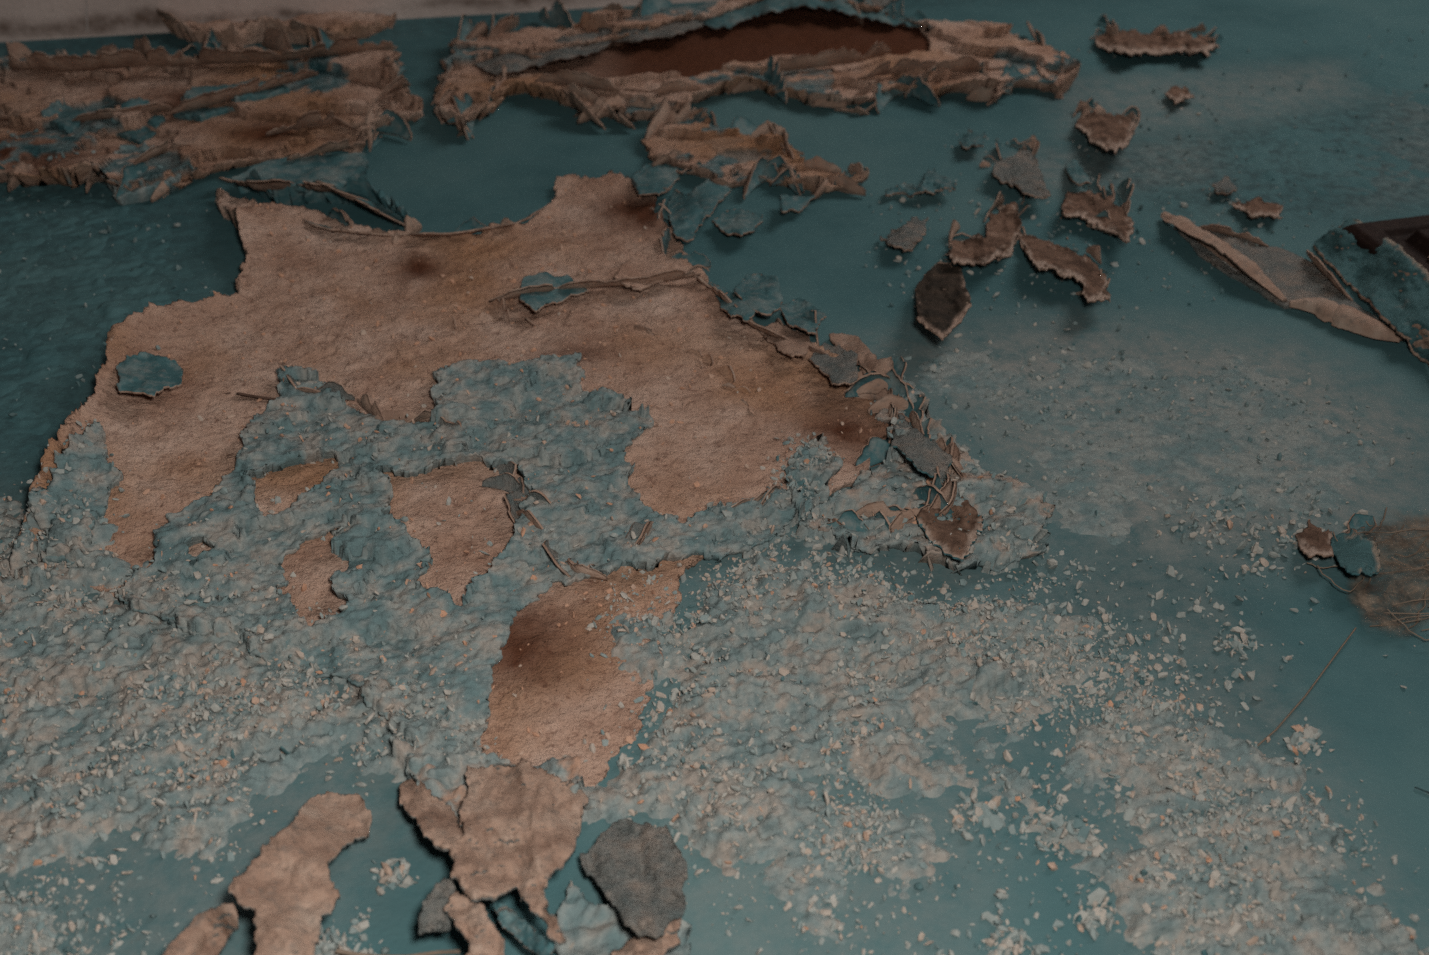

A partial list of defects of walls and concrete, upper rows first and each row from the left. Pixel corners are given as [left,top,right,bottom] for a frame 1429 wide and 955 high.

peeling [1088,14,1223,57]
peeling [1072,98,1141,157]
peeling [1153,85,1214,118]
peeling [874,168,962,265]
peeling [914,127,1111,340]
peeling [1052,159,1134,244]
peeling [1161,171,1429,366]
peeling [915,340,1395,577]
peeling [161,791,390,955]
peeling [905,932,934,955]